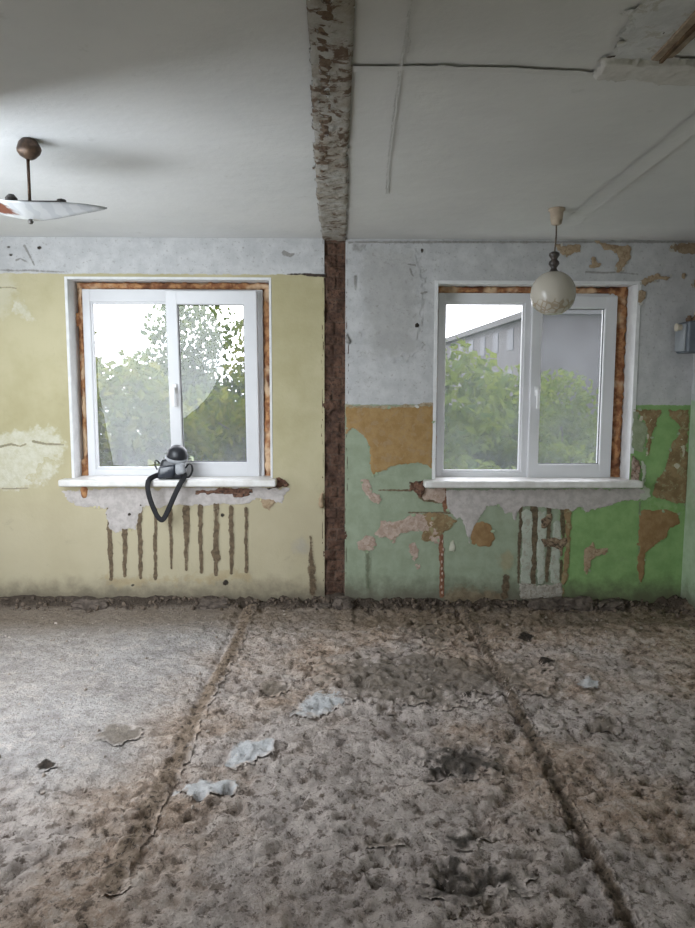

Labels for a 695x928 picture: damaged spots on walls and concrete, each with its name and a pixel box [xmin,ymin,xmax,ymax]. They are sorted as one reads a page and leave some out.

peeling [306,0,334,177]
peeling [594,240,632,273]
peeling [638,272,695,305]
peeling [669,242,695,255]
flaking render [318,240,435,595]
peeling [0,422,69,493]
peeling [62,477,290,533]
peeling [357,408,690,599]